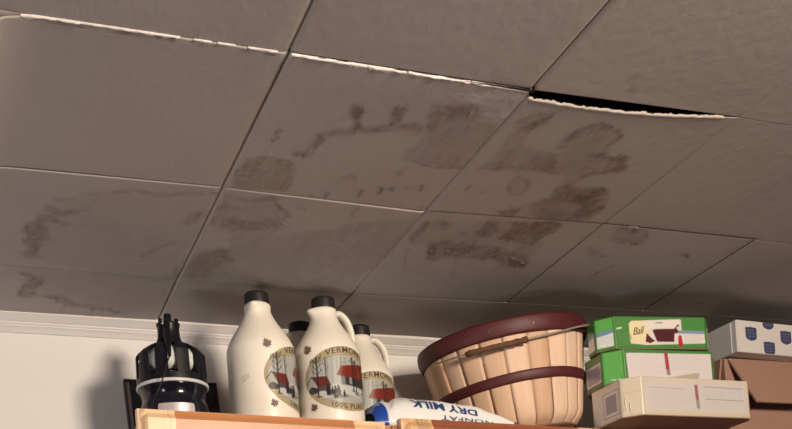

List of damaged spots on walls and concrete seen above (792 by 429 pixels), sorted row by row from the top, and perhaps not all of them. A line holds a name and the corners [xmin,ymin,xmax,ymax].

peeling [190,38,278,56]